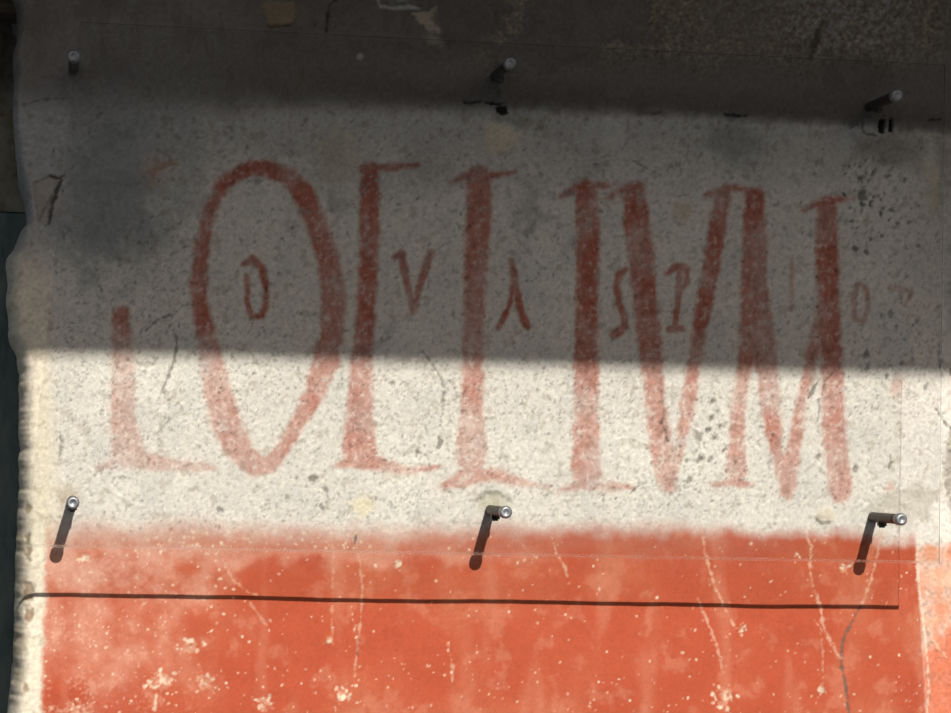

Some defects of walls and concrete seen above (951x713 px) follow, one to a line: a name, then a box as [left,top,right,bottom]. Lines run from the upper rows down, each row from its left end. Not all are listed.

peeling [375,0,444,49]
crack [418,345,460,451]
crack [934,407,951,516]
crack [803,526,885,713]
crack [914,531,951,713]